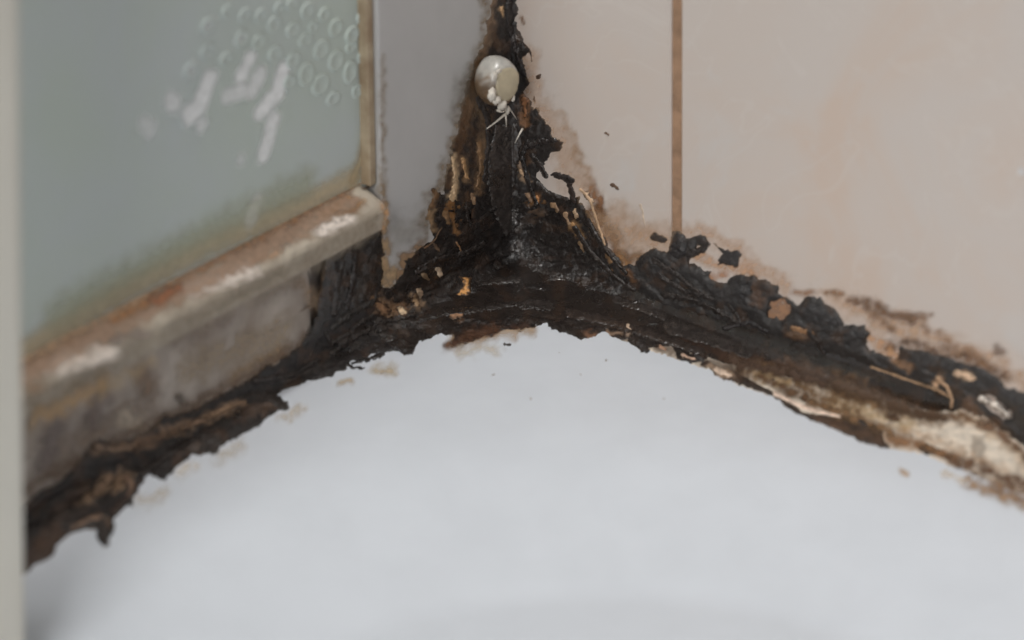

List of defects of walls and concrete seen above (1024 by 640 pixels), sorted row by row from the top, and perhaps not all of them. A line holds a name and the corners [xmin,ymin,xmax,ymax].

water stain [165,50,266,132]
water stain [258,111,280,163]
water stain [22,152,361,356]
water stain [329,0,1024,509]
water stain [23,225,397,574]